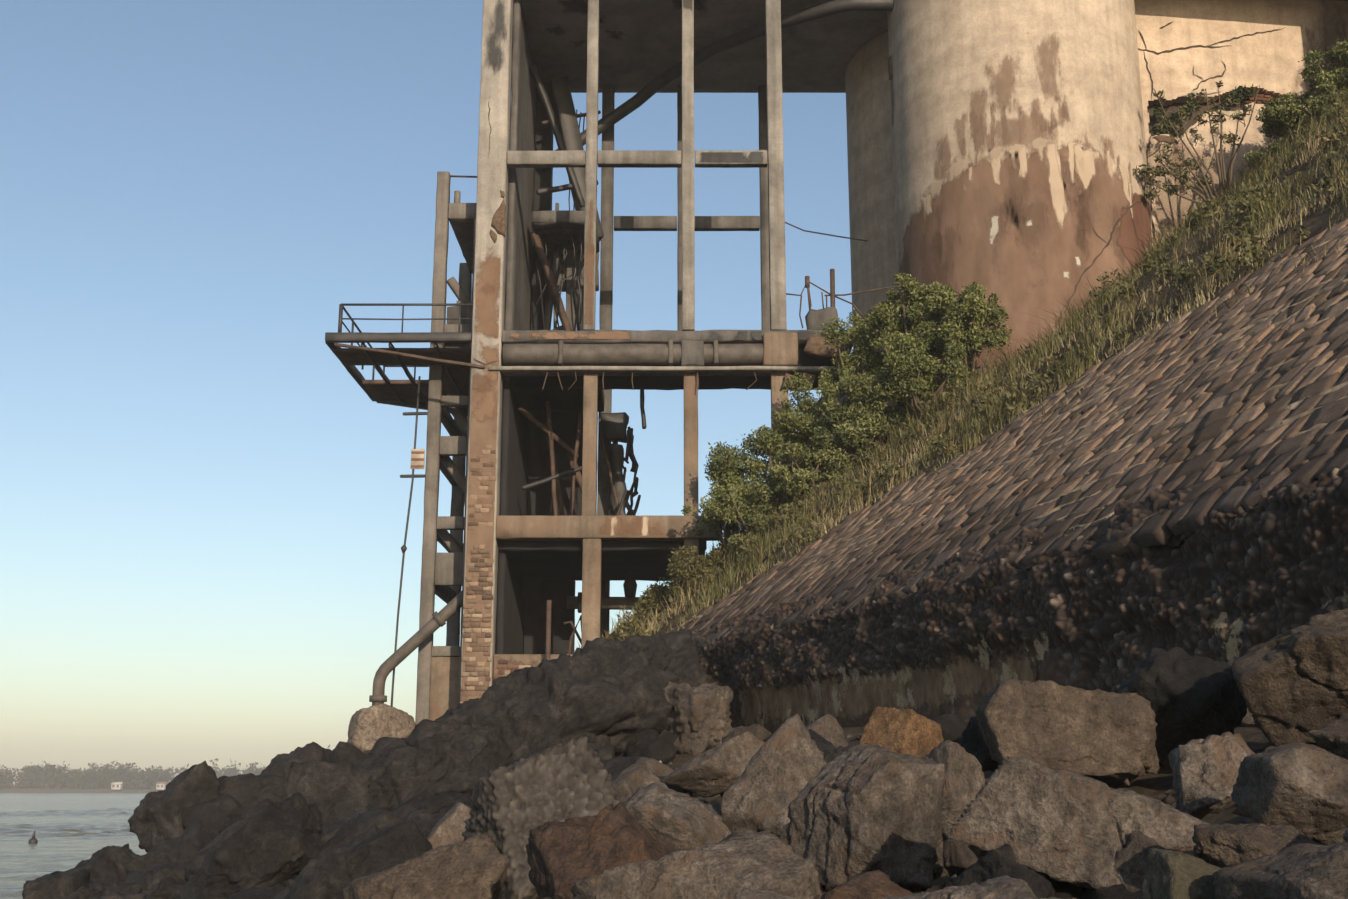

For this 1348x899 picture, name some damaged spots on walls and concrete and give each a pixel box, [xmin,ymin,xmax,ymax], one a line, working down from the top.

leakage [487,0,507,71]
crack [1138,22,1285,100]
spalling [1147,89,1283,144]
spalling [490,190,506,243]
crack [1061,135,1162,317]